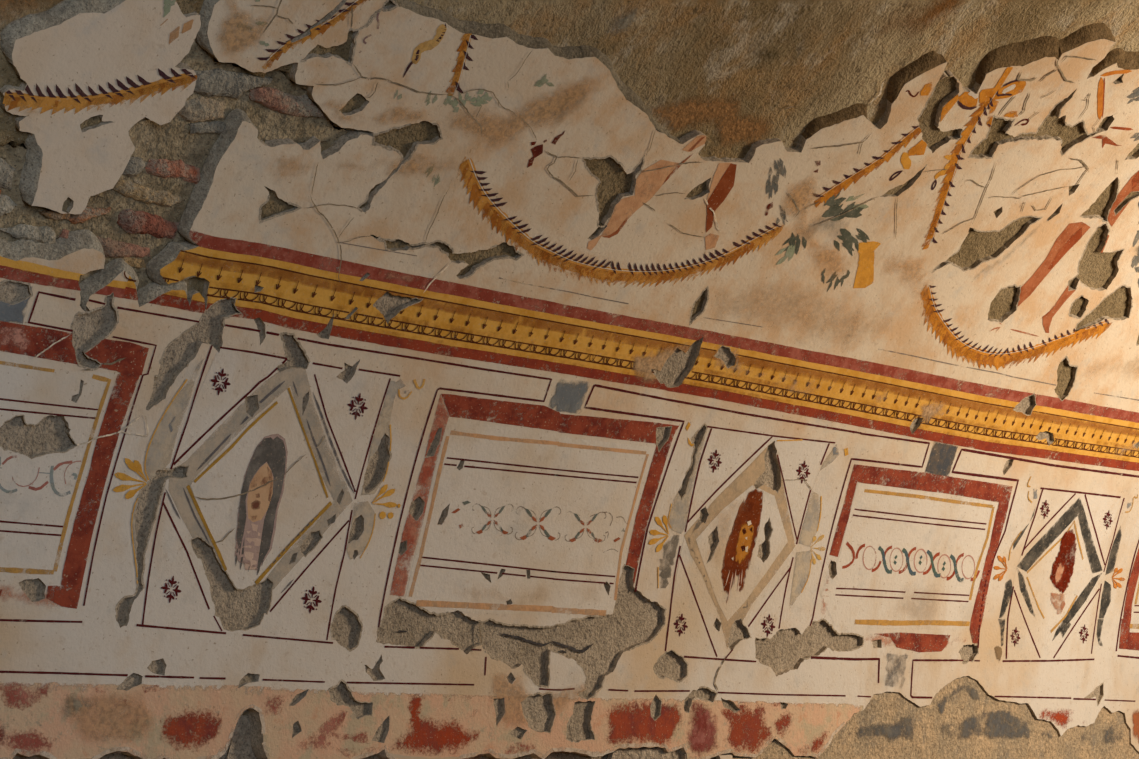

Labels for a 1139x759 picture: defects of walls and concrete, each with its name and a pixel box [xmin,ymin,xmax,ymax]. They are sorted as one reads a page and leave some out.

crack [252,0,293,34]
flaking render [0,38,366,291]
crack [309,165,369,281]
crack [316,51,594,197]
flaking render [582,155,645,238]
crack [640,132,721,238]
flaking render [968,99,1111,159]
flaking render [1068,180,1139,330]
flaking render [0,415,77,459]
flaking render [376,564,686,759]
flaking render [713,618,879,674]
peeling [711,644,1139,759]